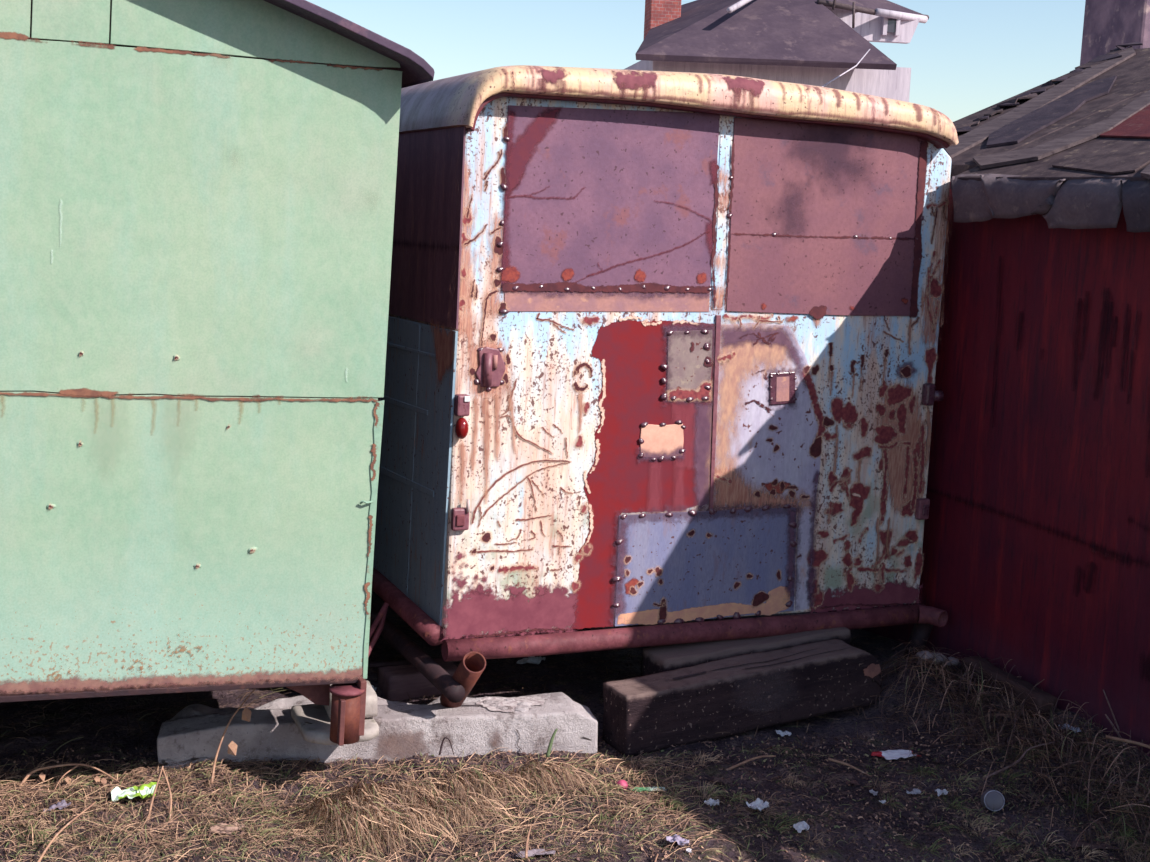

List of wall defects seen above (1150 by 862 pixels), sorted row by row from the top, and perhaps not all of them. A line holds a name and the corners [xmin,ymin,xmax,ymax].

rust [0,32,40,42]
rust [76,41,115,49]
rust [135,47,230,58]
rust [269,59,383,71]
rust [0,388,380,426]
rust [0,634,363,694]